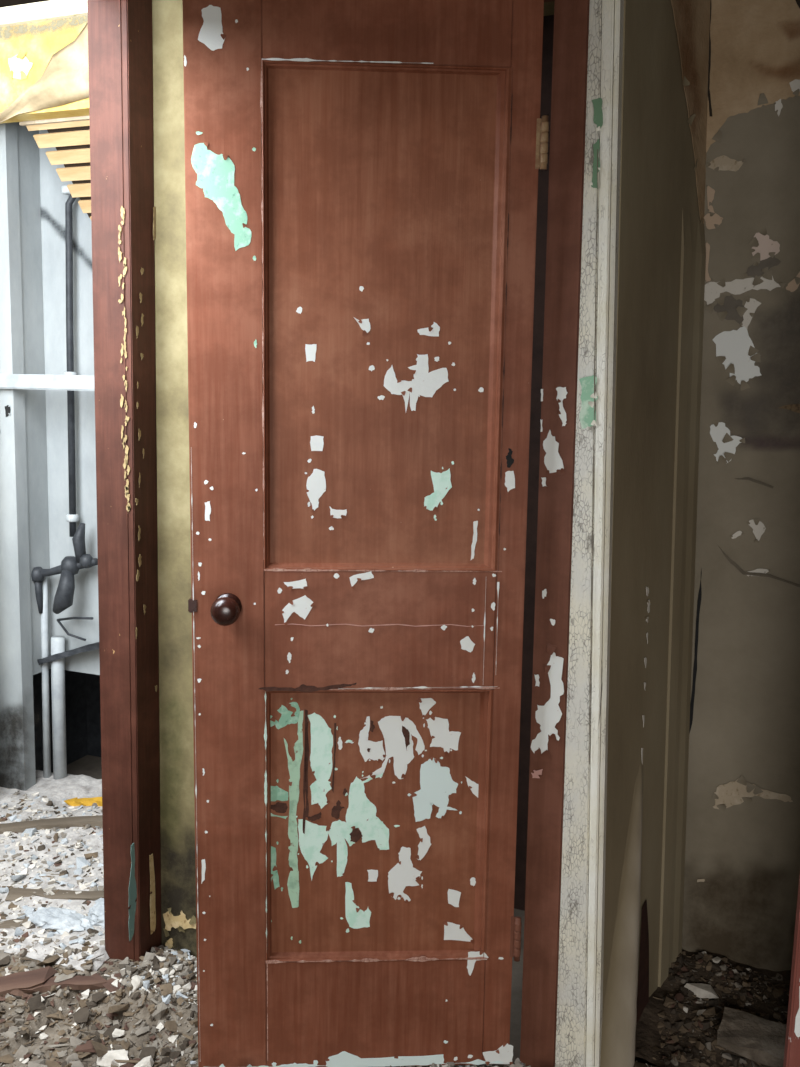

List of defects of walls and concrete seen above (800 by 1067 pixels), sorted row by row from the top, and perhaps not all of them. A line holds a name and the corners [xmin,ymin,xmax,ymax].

peeling [191,131,256,261]
flaking render [671,0,800,391]
peeling [305,344,317,362]
peeling [369,354,456,411]
peeling [417,322,451,345]
peeling [305,435,347,530]
peeling [423,461,454,521]
peeling [540,375,598,489]
peeling [710,421,745,466]
peeling [531,643,564,778]
peeling [270,697,479,933]
peeling [313,1040,513,1067]